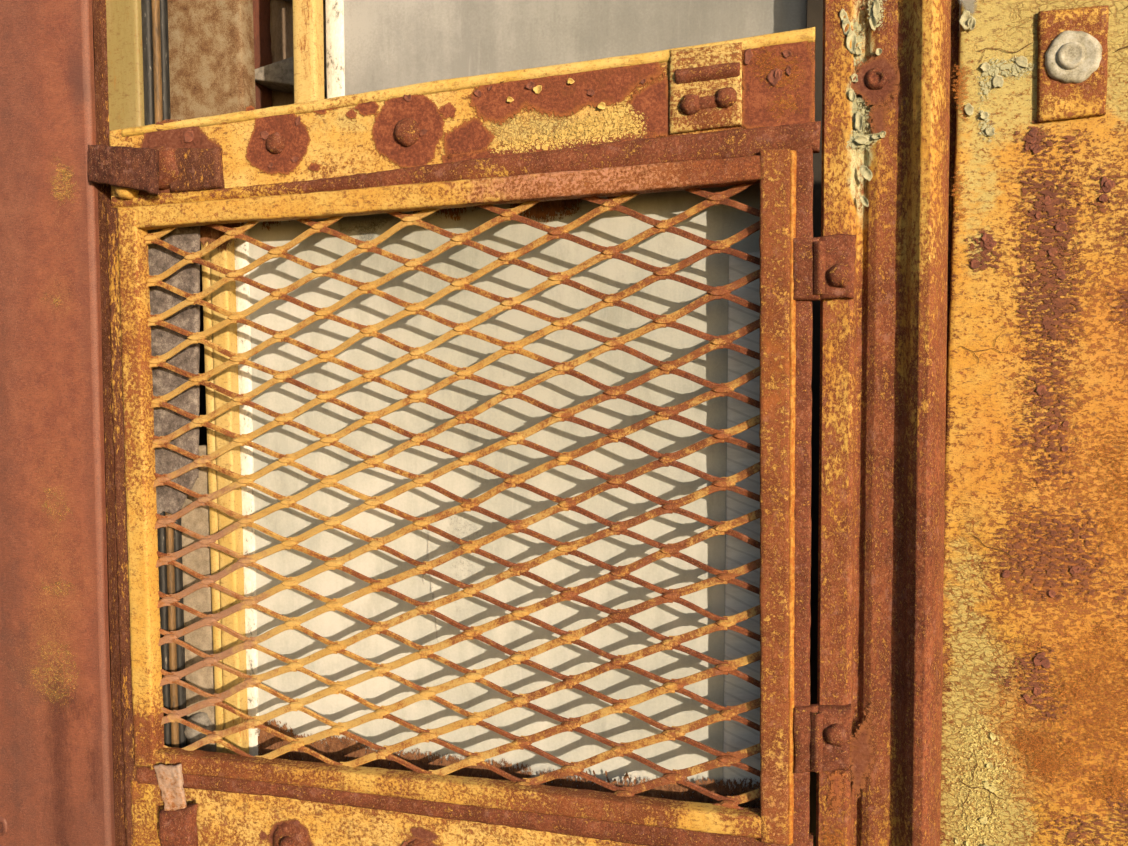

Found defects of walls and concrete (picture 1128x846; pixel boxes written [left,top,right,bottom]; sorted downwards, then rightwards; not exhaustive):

peeling [959,0,976,31]
rust [140,119,222,149]
rust [245,105,320,175]
rust [314,62,672,168]
peeling [490,98,647,154]
peeling [839,0,887,181]
peeling [964,54,1036,143]
rust [506,199,583,224]
rust [965,119,1128,846]
rust [257,719,760,809]
crack [959,749,1003,827]
peeling [947,713,1016,846]